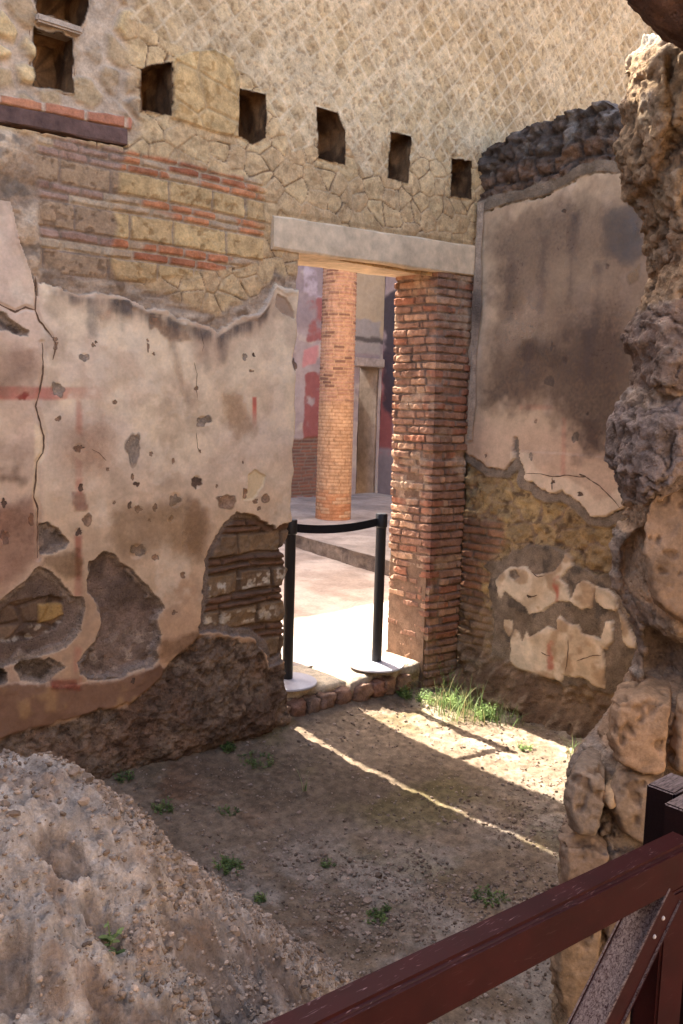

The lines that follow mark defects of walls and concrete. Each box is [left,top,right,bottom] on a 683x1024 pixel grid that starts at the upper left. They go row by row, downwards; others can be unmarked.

flaking render [0,311,30,336]
peeling [276,294,295,318]
crack [0,277,56,558]
spalling [125,434,153,487]
flaking render [465,437,628,528]
crack [526,473,620,508]
flaking render [0,513,177,685]
flaking render [198,461,289,667]
peeling [496,552,637,688]